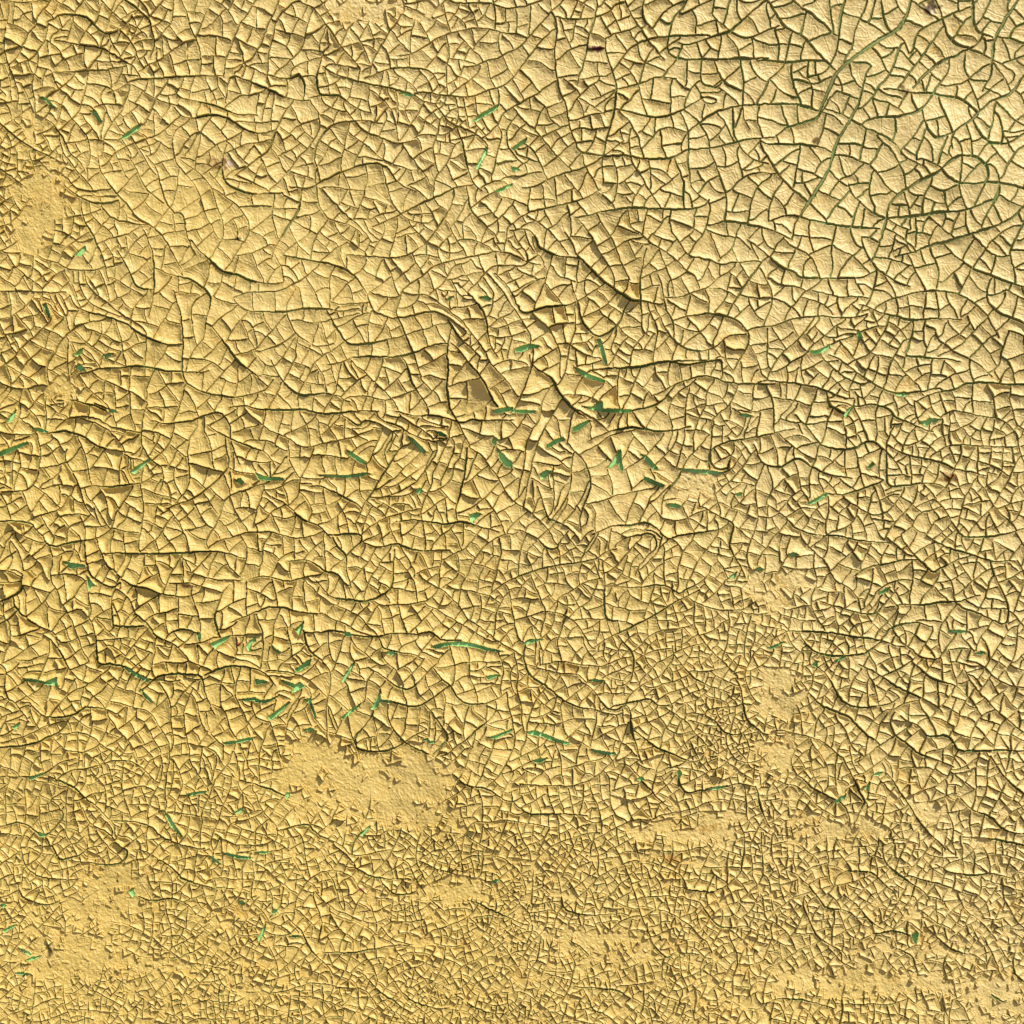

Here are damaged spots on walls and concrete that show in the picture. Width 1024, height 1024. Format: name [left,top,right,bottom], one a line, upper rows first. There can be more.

crack [0,220,16,254]
peeling [508,320,551,370]
peeling [470,329,725,520]
peeling [125,666,168,713]
peeling [185,610,406,749]
peeling [425,625,550,684]
peeling [479,717,619,764]
crack [896,772,931,798]
crack [0,843,99,940]
crack [0,899,174,1024]
crack [500,985,539,1024]
crack [730,1003,761,1024]